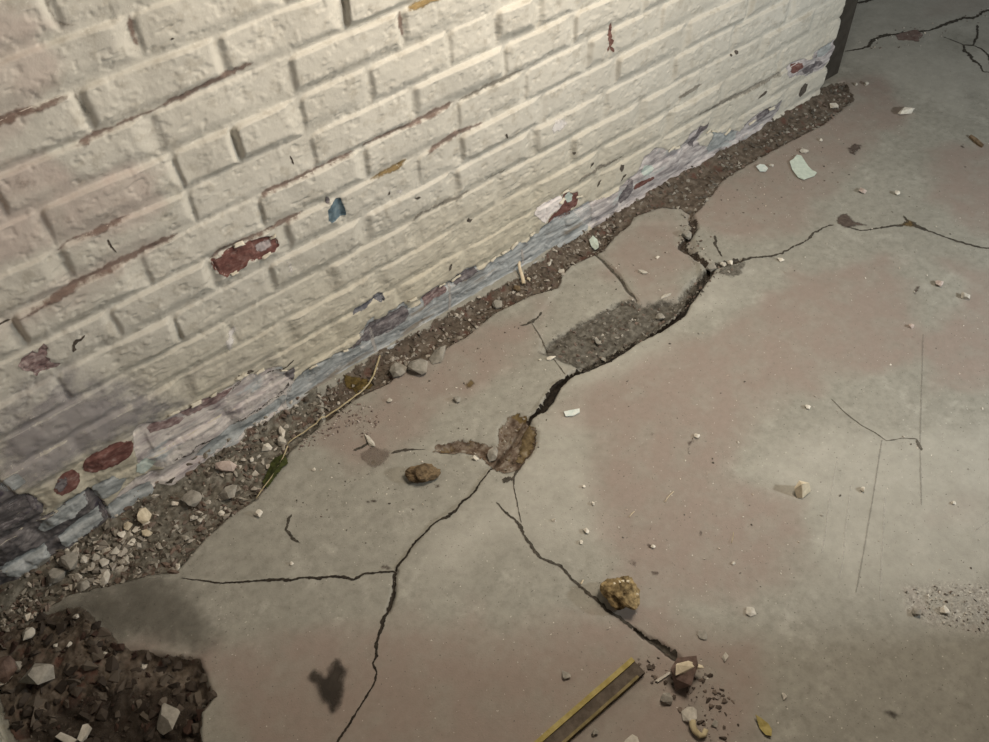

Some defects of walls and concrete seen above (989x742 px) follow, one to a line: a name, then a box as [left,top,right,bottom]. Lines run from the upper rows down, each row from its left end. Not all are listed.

peeling [786,40,835,97]
crack [847,9,989,72]
peeling [790,155,817,180]
peeling [0,100,782,585]
crack [520,215,989,426]
crack [173,360,294,462]
crack [391,447,424,455]
crack [832,400,923,451]
crack [183,449,677,742]
spalling [55,724,92,742]